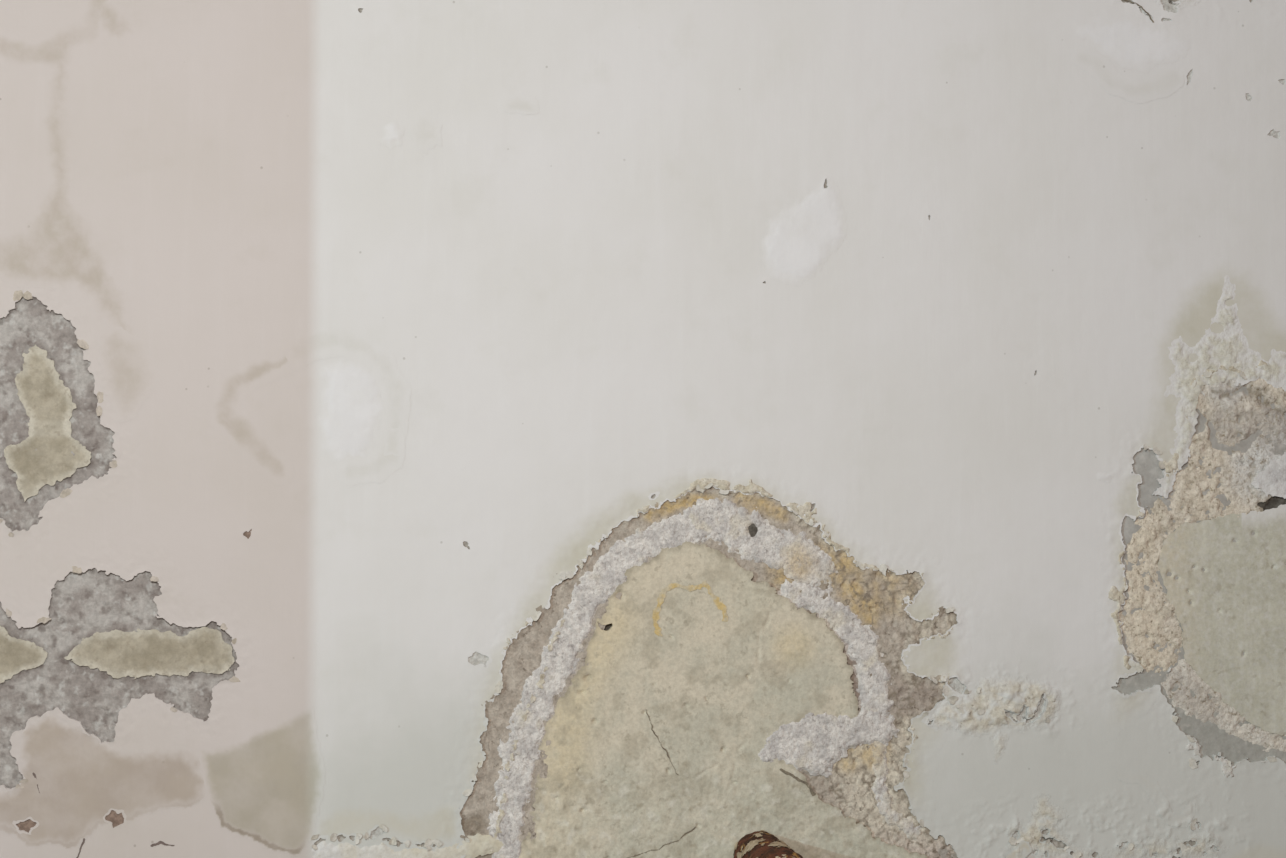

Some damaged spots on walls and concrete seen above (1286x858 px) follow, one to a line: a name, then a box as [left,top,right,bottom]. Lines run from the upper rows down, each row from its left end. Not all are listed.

peeling [1121,0,1201,23]
flaking render [0,290,117,537]
flaking render [1108,275,1286,778]
flaking render [0,566,241,789]
flaking render [311,478,1063,858]
peeling [1005,793,1230,858]